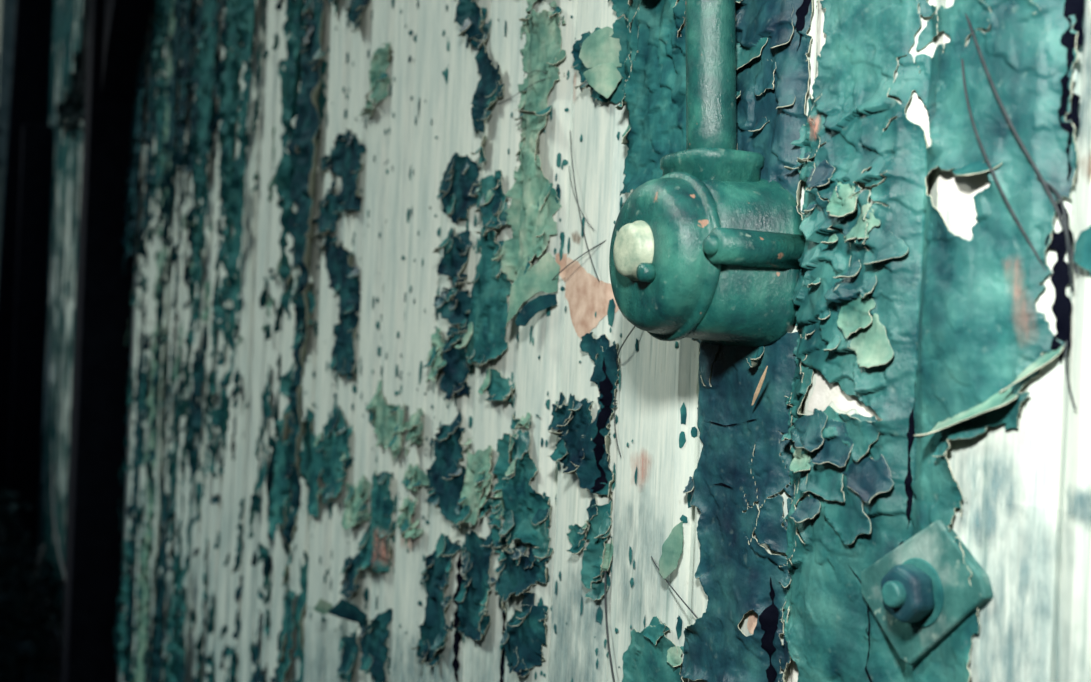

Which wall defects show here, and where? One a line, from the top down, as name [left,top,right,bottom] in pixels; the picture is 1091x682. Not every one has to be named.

peeling [113,0,686,682]
peeling [622,0,1079,682]
crack [850,567,872,682]
peeling [1074,225,1091,274]